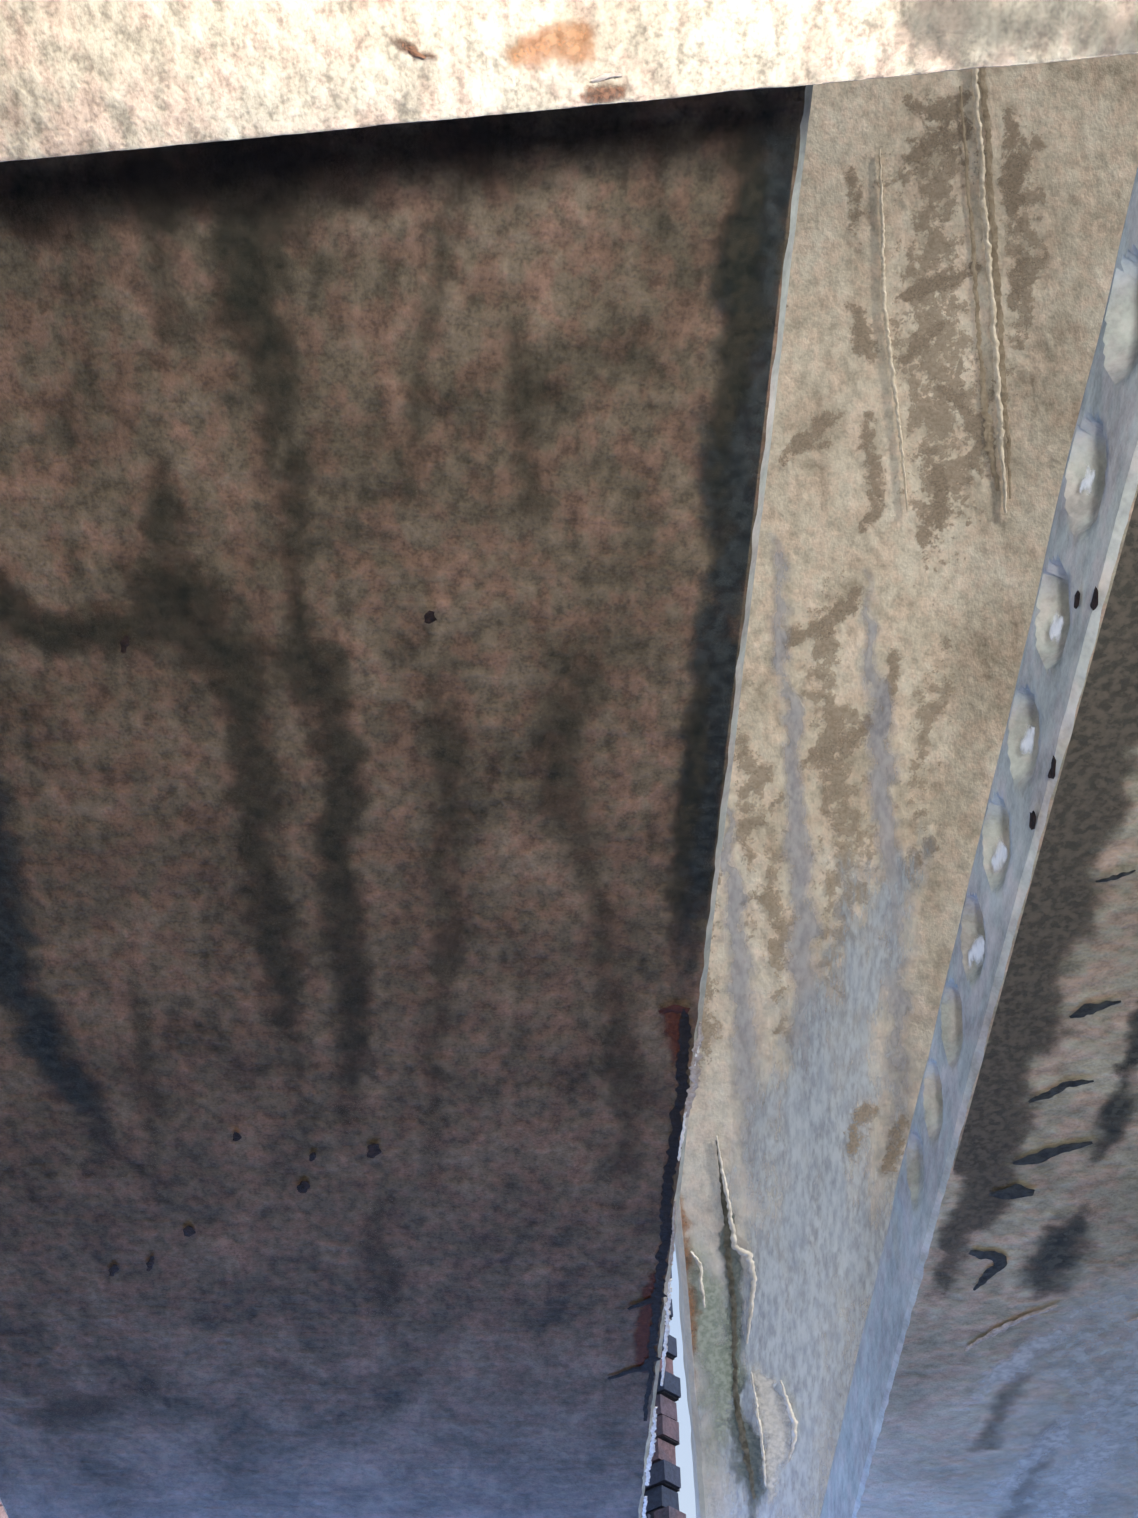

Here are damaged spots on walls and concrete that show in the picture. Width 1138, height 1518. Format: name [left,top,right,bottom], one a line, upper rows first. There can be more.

corrosion [511,25,590,65]
leakage [211,187,292,439]
leakage [0,788,107,1137]
leakage [0,470,297,1027]
leakage [283,618,366,1074]
leakage [674,113,913,1518]
leakage [935,493,1138,1291]
corrosion [634,1273,656,1373]
peeling [750,1371,798,1502]